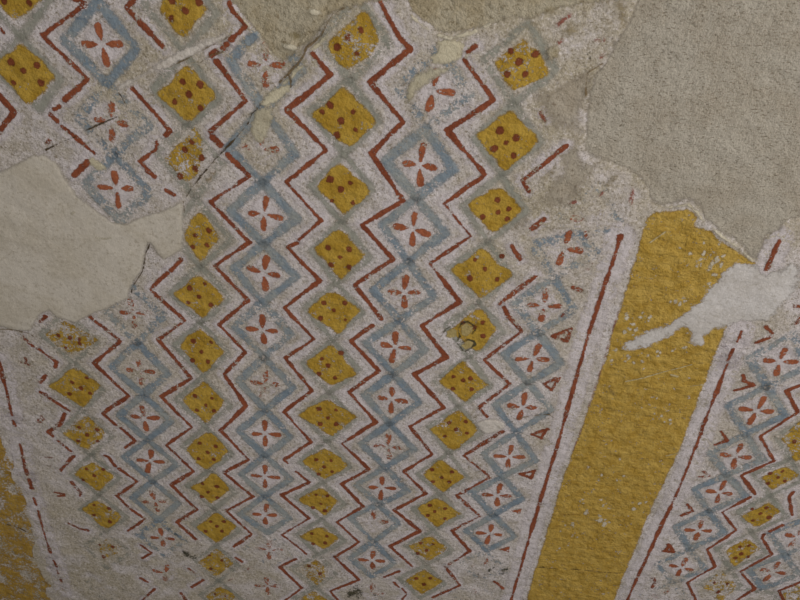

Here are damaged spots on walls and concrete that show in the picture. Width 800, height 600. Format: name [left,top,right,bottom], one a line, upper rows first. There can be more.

spalling [408,0,604,40]
crack [279,7,344,87]
crack [183,108,258,211]
peeling [679,242,726,288]
spalling [443,321,476,351]